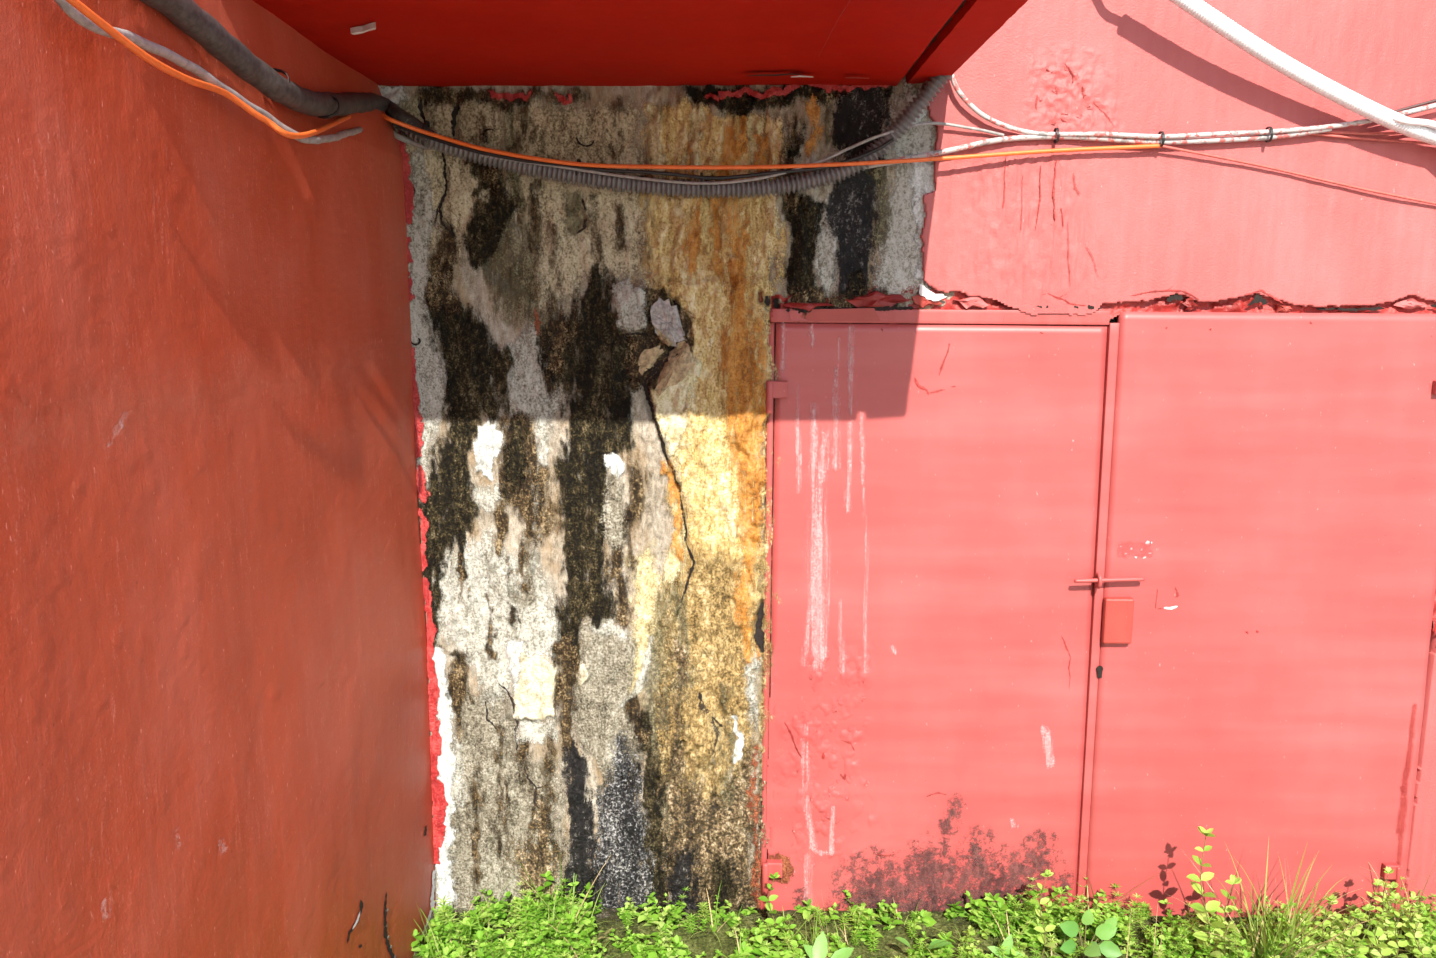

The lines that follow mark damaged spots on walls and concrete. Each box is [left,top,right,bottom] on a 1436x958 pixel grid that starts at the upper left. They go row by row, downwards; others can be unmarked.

leakage [378,79,937,911]
crack [626,300,695,602]
rust [660,459,684,563]
rust [682,115,775,665]
flaking render [1074,293,1436,320]
leakage [804,793,1073,912]